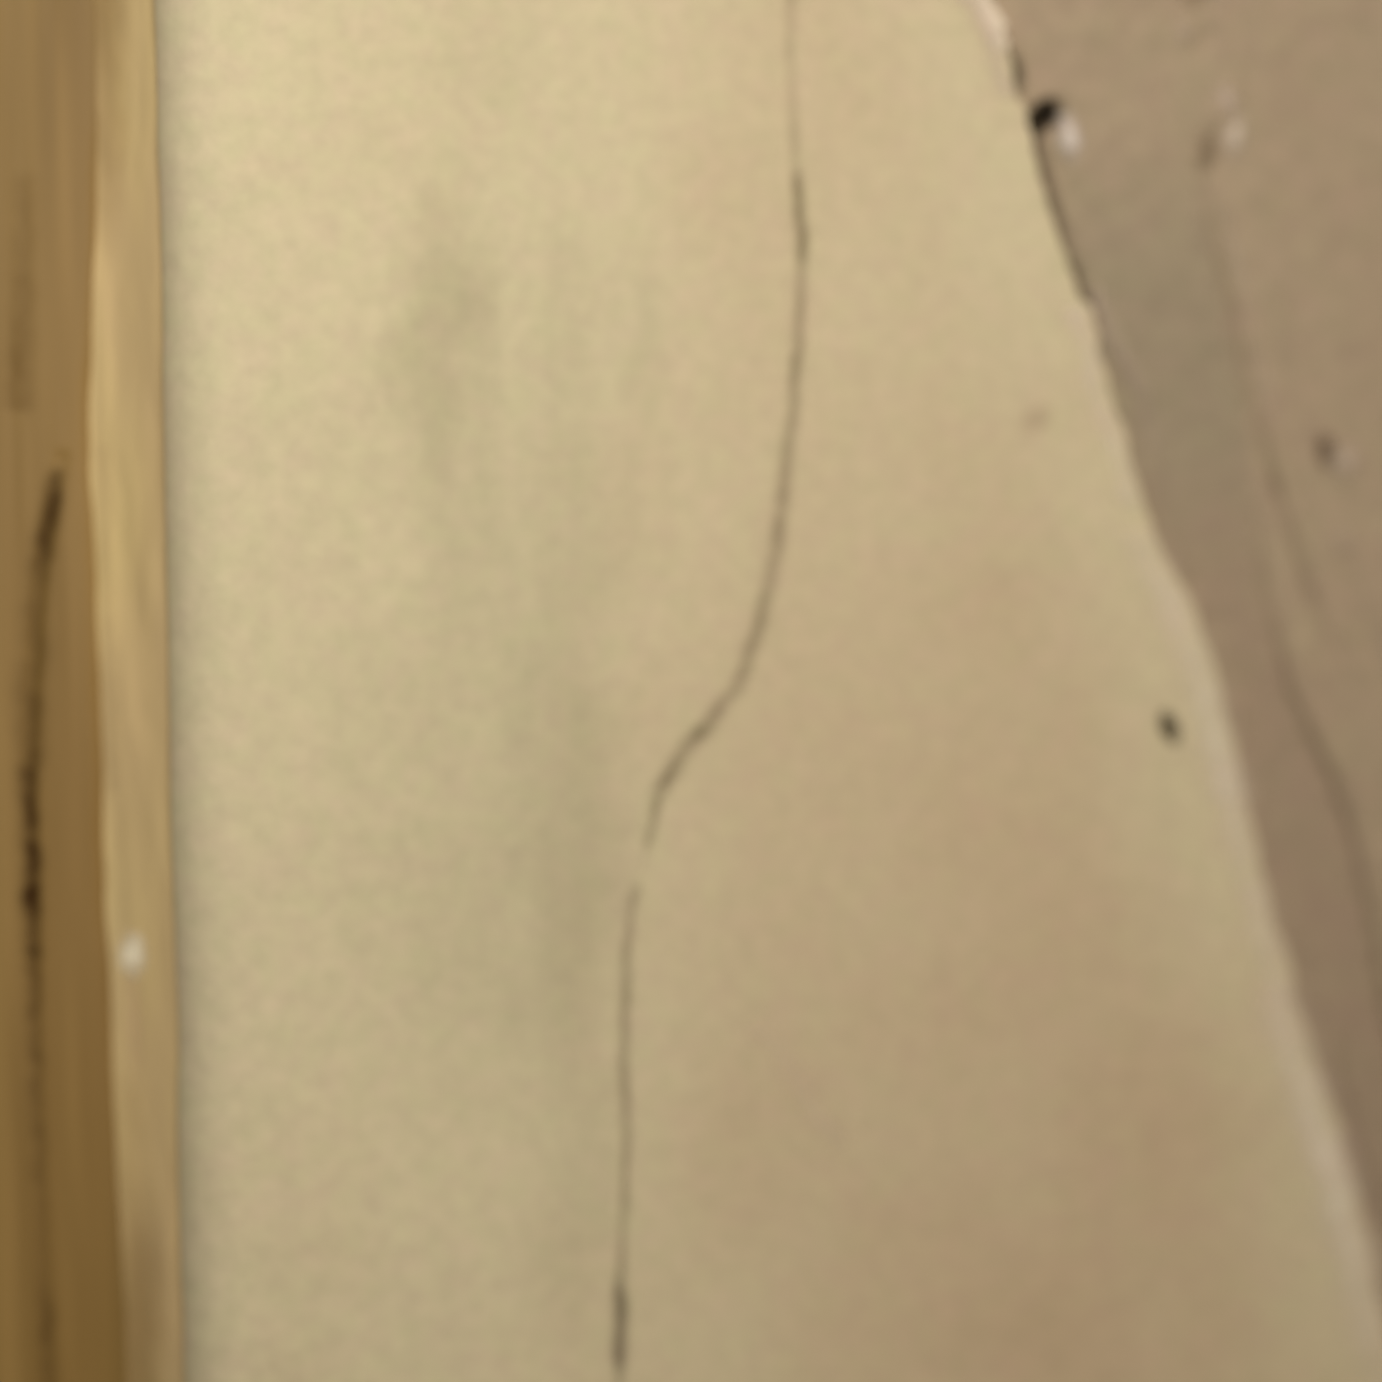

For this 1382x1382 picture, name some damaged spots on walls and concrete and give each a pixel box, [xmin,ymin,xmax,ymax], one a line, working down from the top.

spalling [976,0,1382,1302]